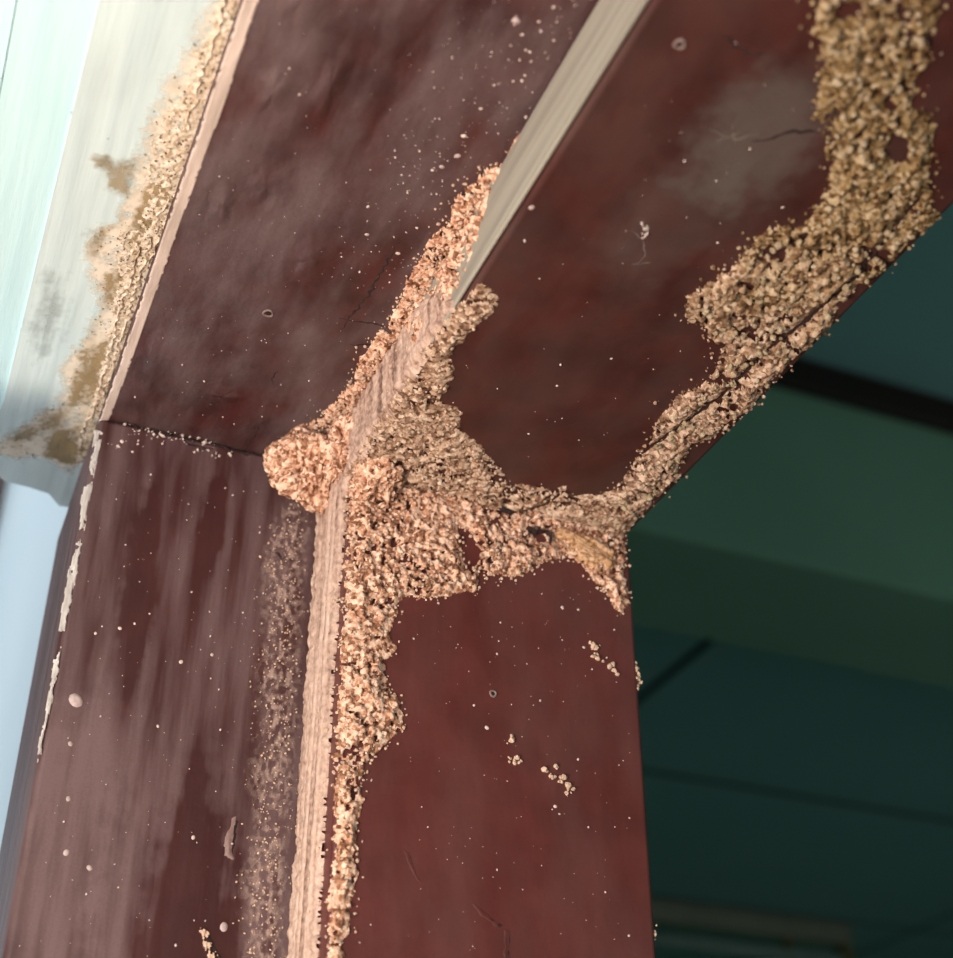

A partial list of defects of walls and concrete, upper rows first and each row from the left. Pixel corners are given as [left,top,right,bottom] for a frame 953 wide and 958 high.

water stain [0,0,240,468]
crack [752,129,818,142]